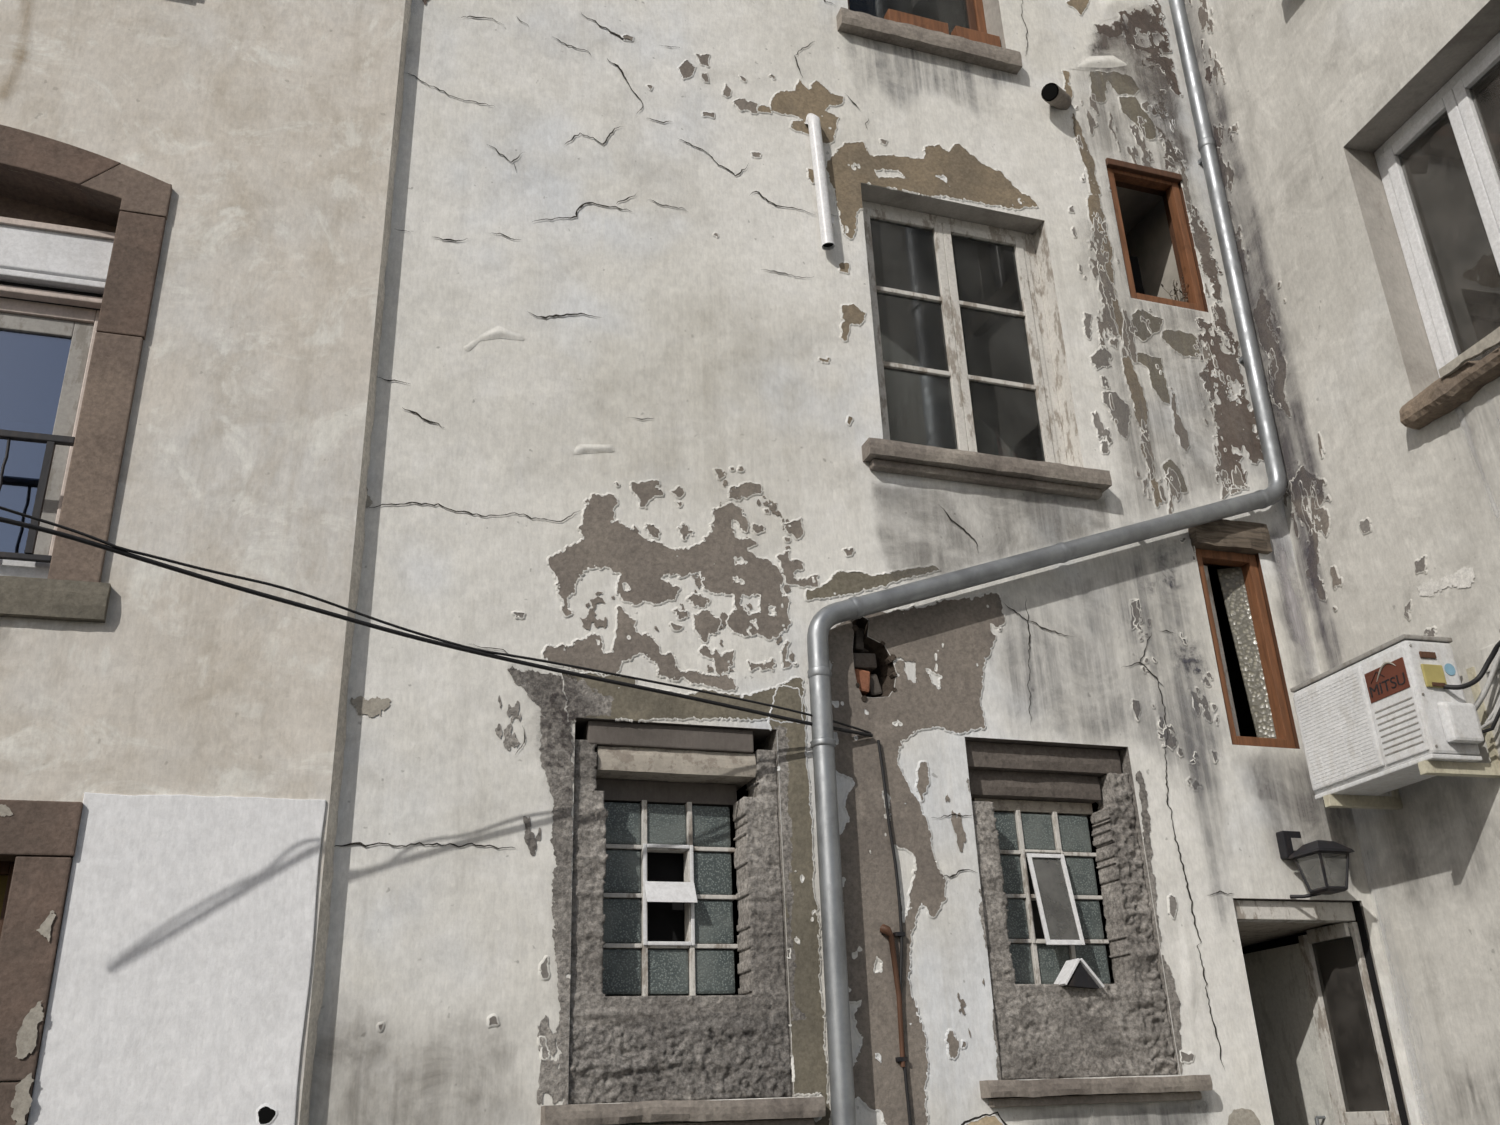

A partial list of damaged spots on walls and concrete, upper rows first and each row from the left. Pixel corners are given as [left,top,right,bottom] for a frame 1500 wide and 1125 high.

crack [396,194,688,242]
crack [527,311,602,319]
crack [461,14,834,216]
peeling [677,53,1039,241]
peeling [1061,0,1292,515]
crack [370,502,578,522]
crack [335,841,514,849]
peeling [495,465,941,1125]
peeling [828,591,1006,1125]
crack [1125,630,1233,1067]
spalling [11,1001,44,1125]
spalling [256,1103,279,1125]